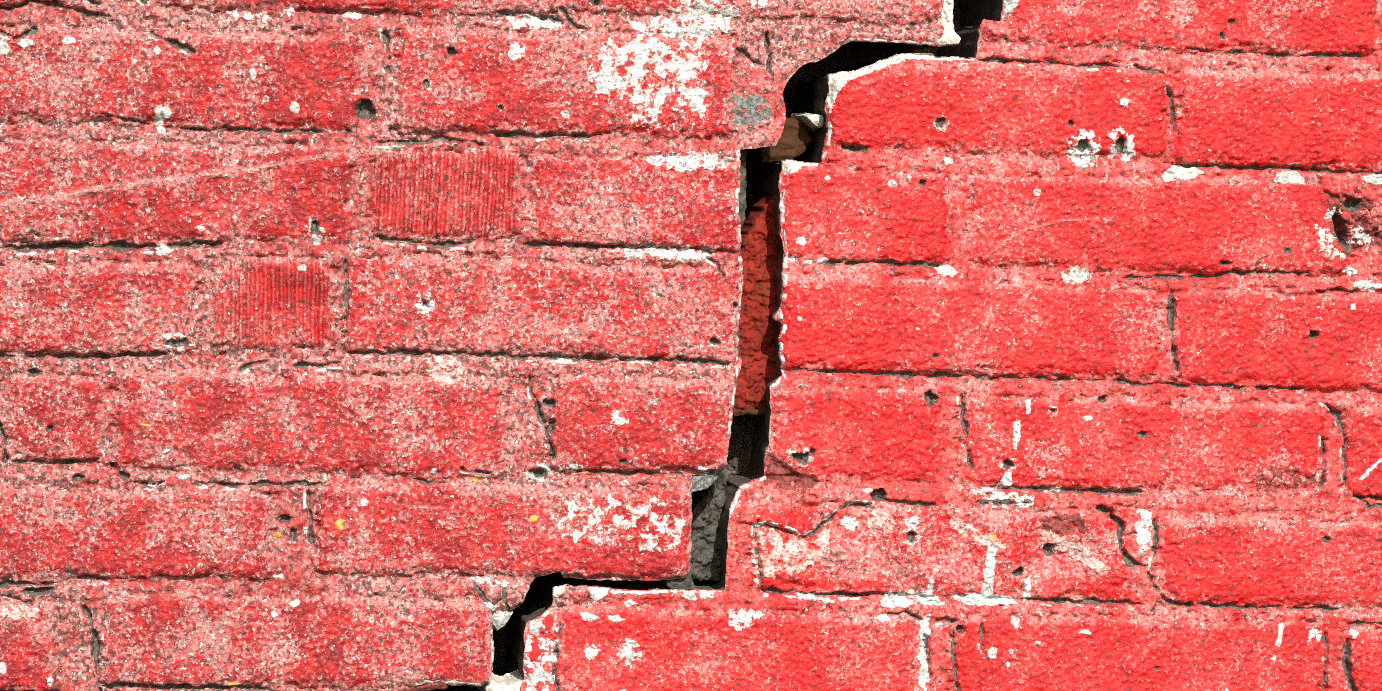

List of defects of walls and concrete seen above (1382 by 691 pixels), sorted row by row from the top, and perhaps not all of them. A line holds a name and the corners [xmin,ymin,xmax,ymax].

peeling [583,0,774,132]
spalling [1314,173,1382,311]
crack [388,0,1020,691]